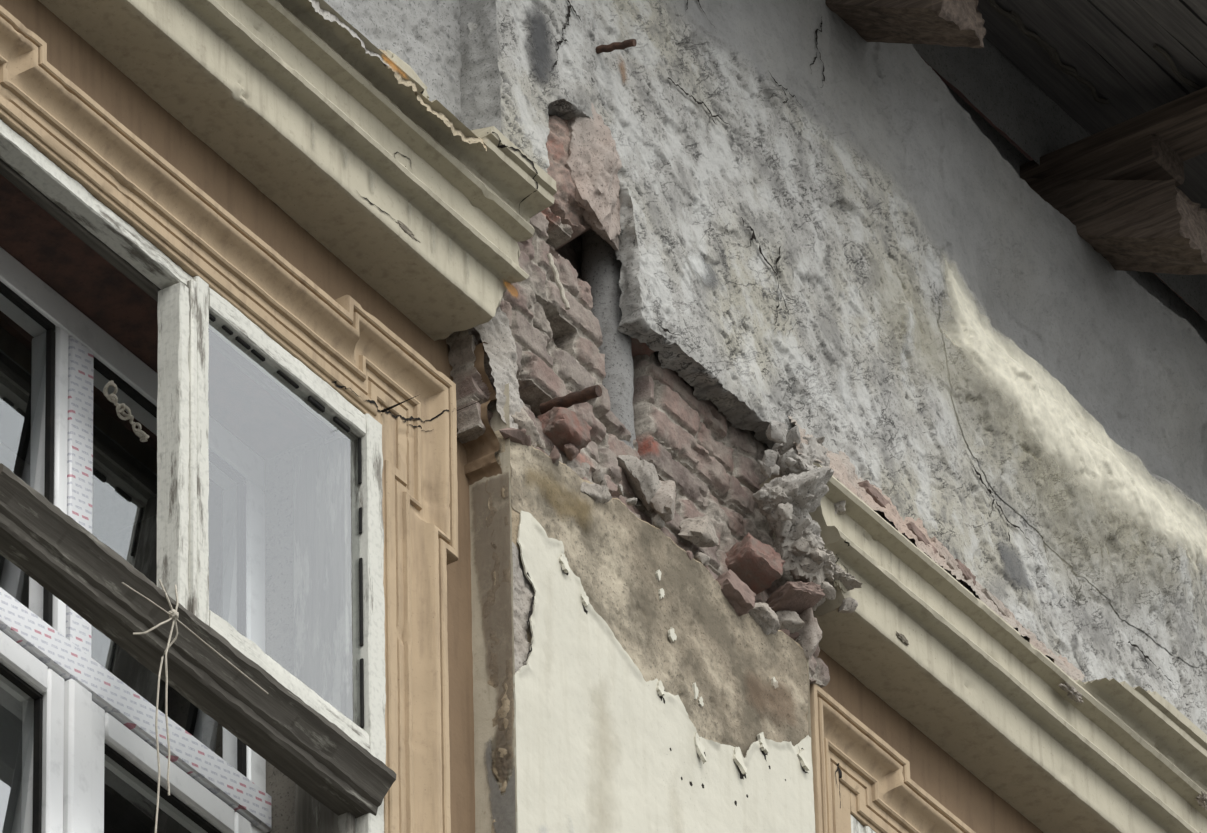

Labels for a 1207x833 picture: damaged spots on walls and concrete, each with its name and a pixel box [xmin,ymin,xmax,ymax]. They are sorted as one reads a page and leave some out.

flaking render [386,50,429,100]
crack [549,0,582,93]
crack [769,17,825,108]
crack [333,381,481,432]
spalling [446,103,863,806]
crack [972,464,1031,550]
crack [1128,641,1175,686]